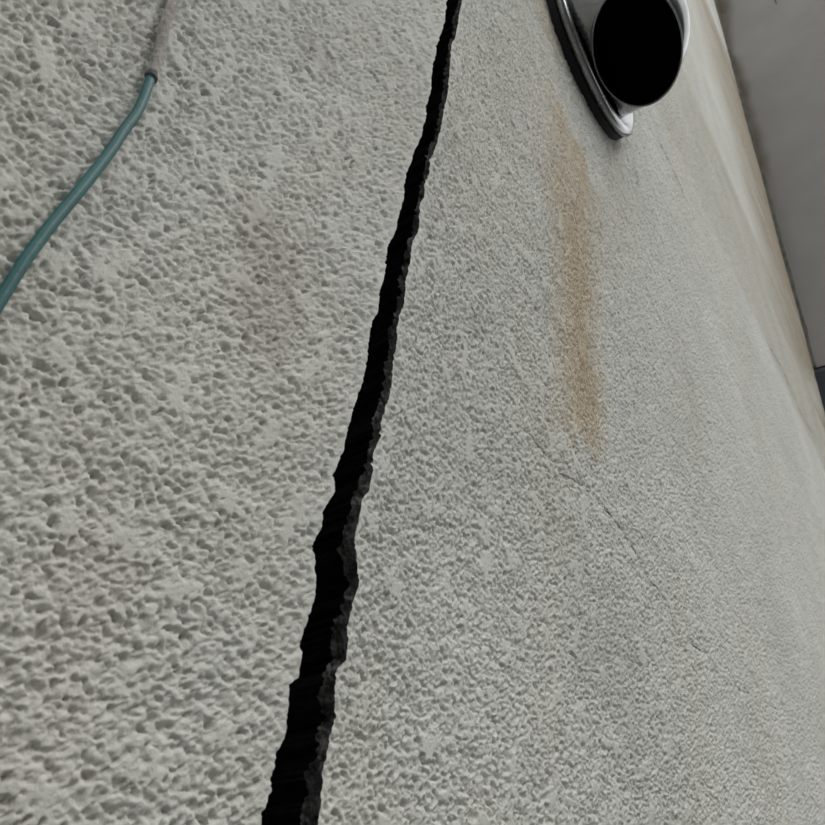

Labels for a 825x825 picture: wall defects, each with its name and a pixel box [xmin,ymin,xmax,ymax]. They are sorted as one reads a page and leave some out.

crack [261,0,462,825]